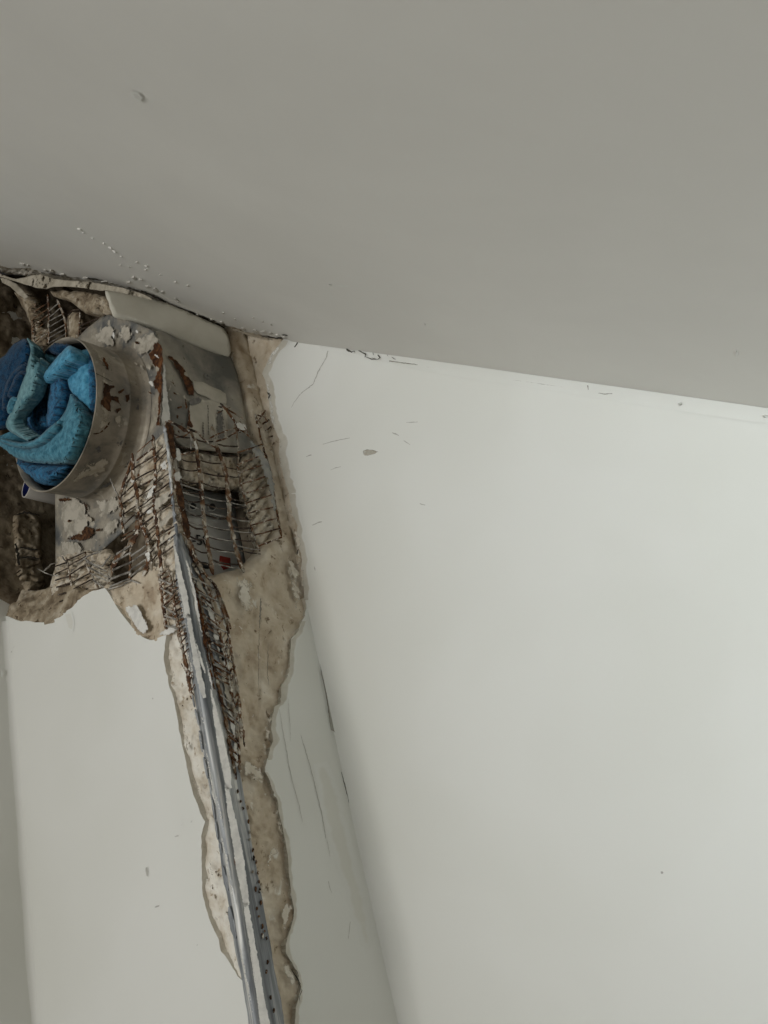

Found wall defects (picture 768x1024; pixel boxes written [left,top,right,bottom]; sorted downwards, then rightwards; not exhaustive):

rust [93,382,130,434]
rust [148,342,194,471]
rust [68,527,100,541]
rust [162,482,191,539]
flaking render [0,247,311,1024]
rust [194,587,215,689]